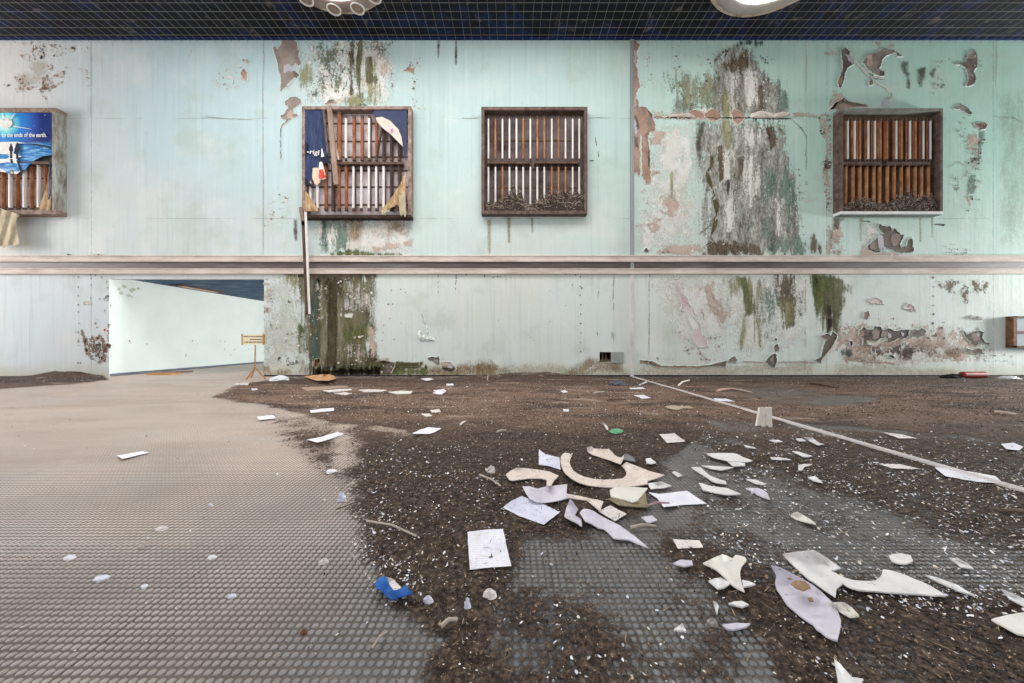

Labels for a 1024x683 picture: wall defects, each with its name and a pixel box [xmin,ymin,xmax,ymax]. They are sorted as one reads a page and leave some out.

peeling [3,42,90,99]
peeling [273,40,302,128]
leakage [299,40,396,106]
peeling [933,49,982,94]
peeling [634,40,769,255]
leakage [663,40,822,255]
peeling [793,43,904,255]
peeling [861,224,915,255]
leakage [286,274,382,375]
leakage [730,274,796,347]
peeling [246,326,535,607]
peeling [538,277,1024,654]